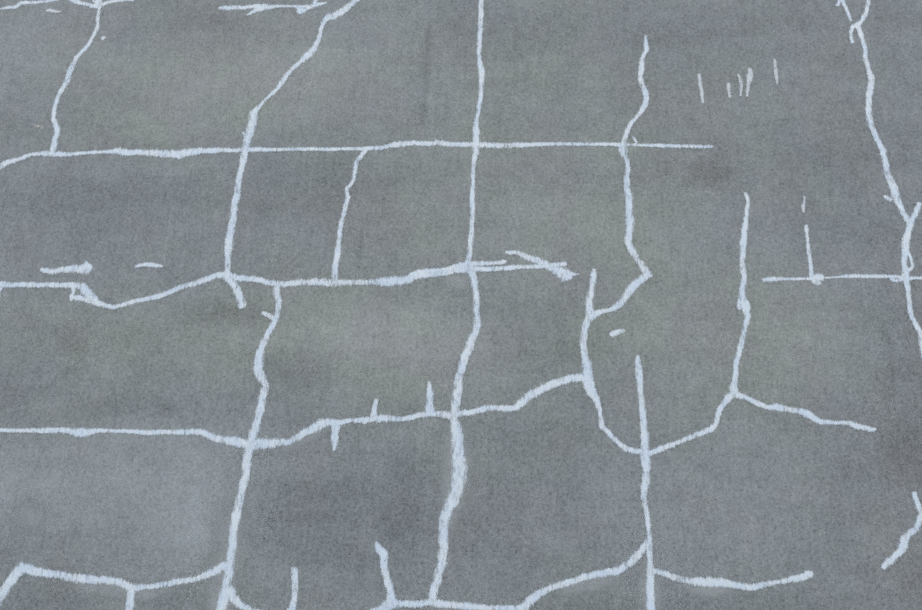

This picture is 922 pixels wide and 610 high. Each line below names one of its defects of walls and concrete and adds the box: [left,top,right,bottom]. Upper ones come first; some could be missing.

crack [0,0,648,610]
crack [505,35,876,610]
crack [762,0,922,358]
crack [881,492,922,570]